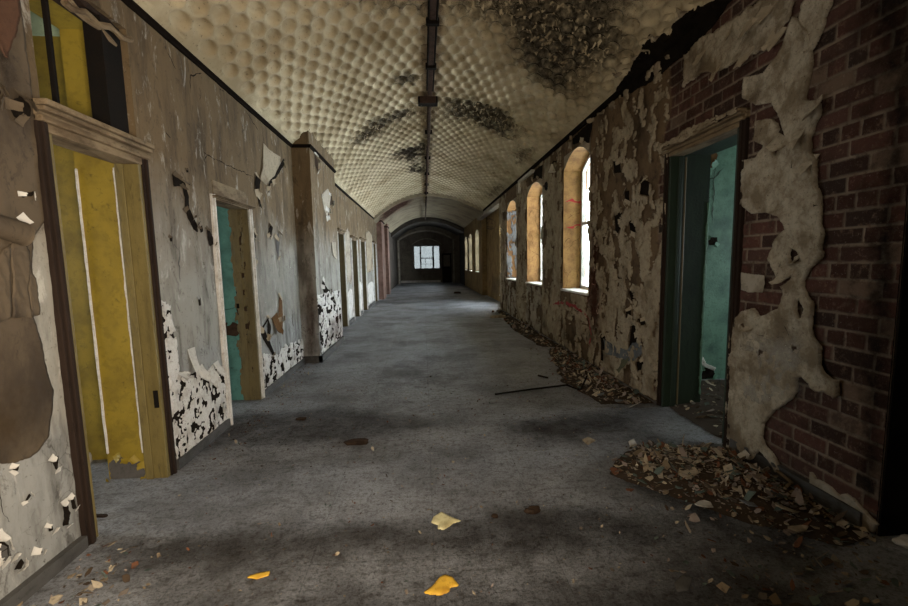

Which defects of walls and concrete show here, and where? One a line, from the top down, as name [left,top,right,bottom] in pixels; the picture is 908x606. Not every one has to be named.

water stain [459,0,631,90]
peeling [0,0,54,476]
peeling [172,168,217,246]
flaking render [254,143,286,208]
water stain [357,109,412,143]
water stain [394,143,426,173]
water stain [445,97,516,137]
peeling [439,0,840,472]
peeling [316,229,374,353]
peeling [161,300,228,459]
peeling [260,313,304,389]
spalling [0,528,48,574]